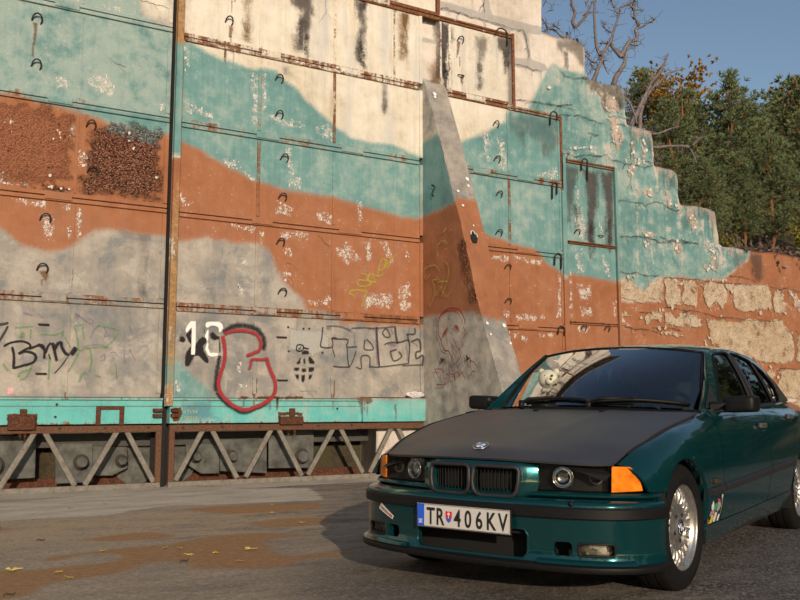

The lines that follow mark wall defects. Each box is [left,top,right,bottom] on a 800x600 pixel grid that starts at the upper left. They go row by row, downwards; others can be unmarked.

rust [218,27,240,62]
water stain [291,0,313,54]
water stain [355,1,366,67]
crack [441,0,539,73]
water stain [498,37,511,70]
crack [515,99,680,216]
peeling [598,89,650,176]
water stain [583,169,614,252]
peeling [613,240,800,407]